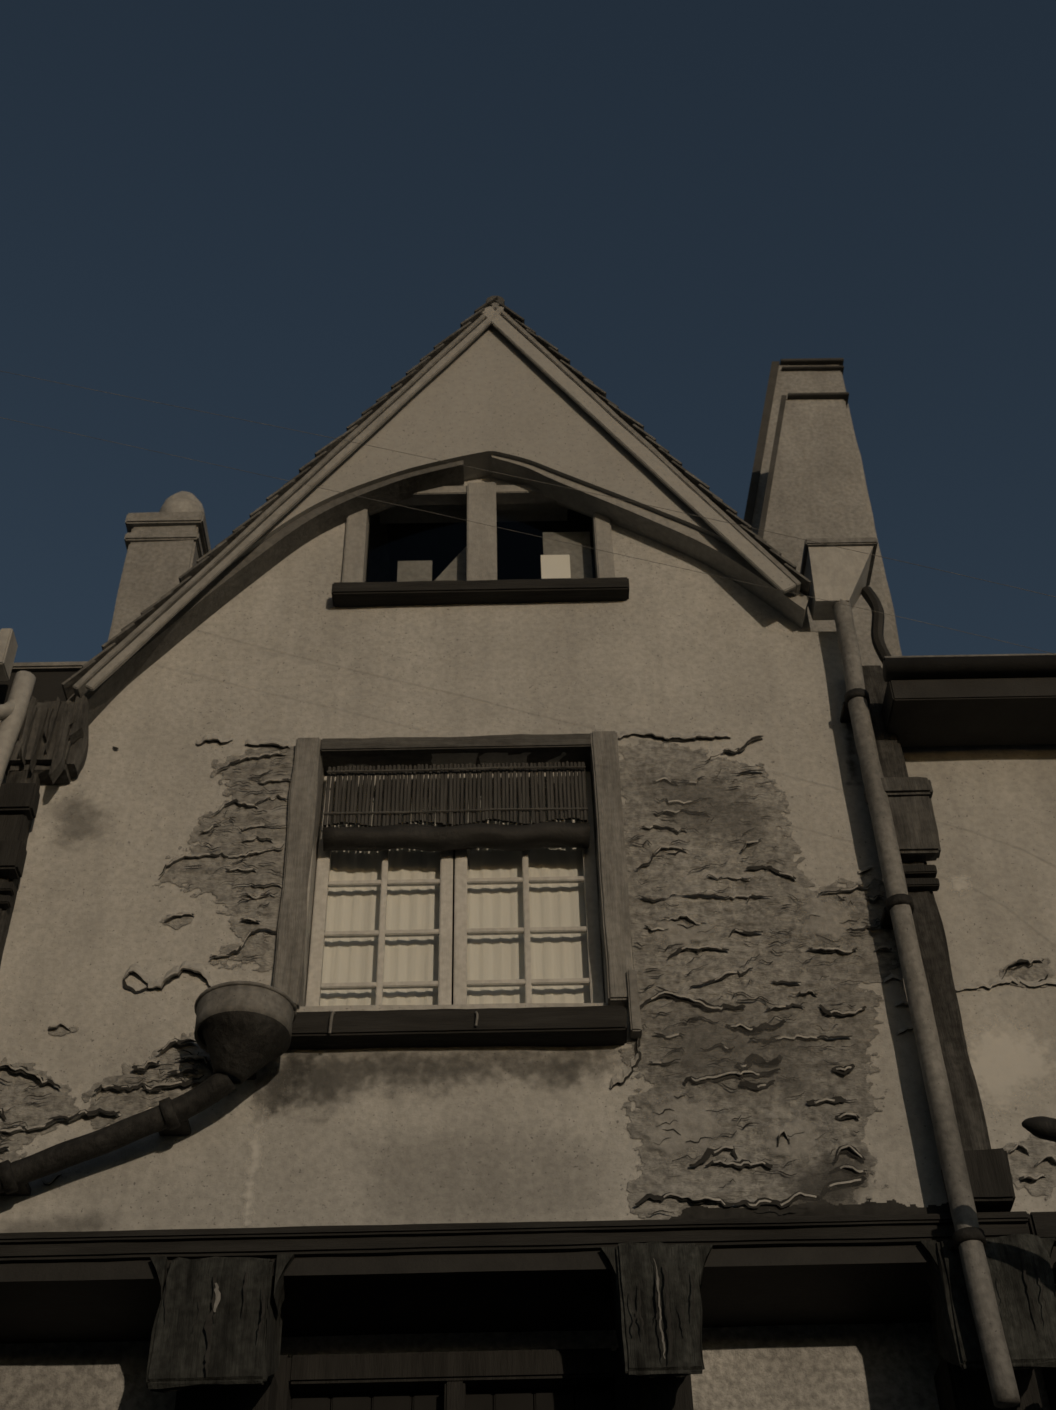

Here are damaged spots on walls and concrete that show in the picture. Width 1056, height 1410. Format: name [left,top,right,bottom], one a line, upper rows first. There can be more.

peeling [154,746,296,972]
peeling [617,735,951,1220]
crack [955,959,1056,991]
peeling [999,957,1055,988]
peeling [0,1032,214,1163]
peeling [1003,1134,1056,1201]